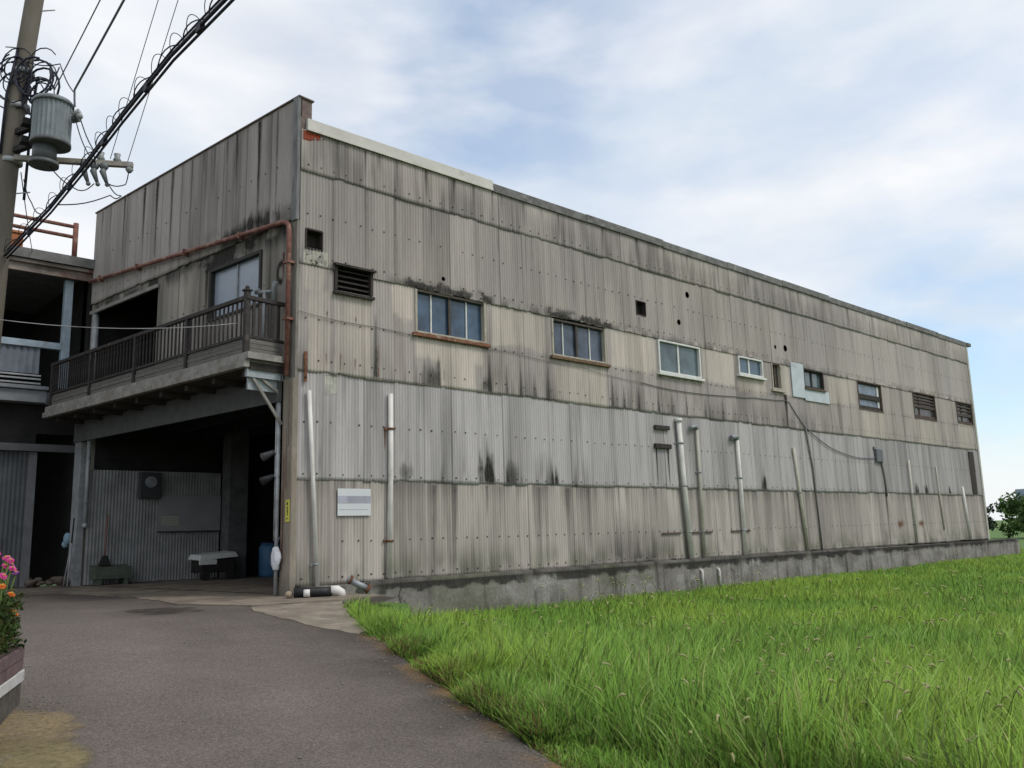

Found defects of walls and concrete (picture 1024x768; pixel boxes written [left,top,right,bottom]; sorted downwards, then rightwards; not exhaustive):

leakage [200,211,279,287]
leakage [427,363,440,386]
leakage [479,457,494,488]